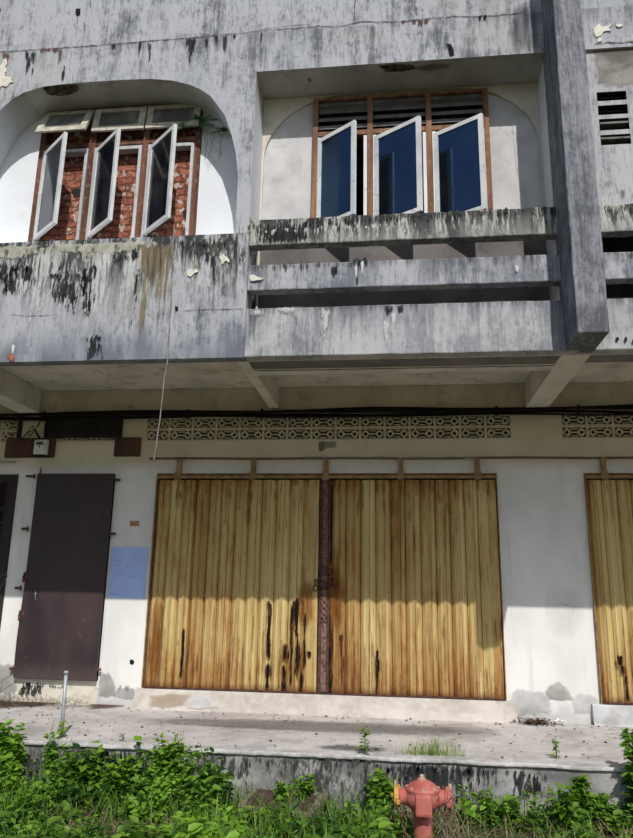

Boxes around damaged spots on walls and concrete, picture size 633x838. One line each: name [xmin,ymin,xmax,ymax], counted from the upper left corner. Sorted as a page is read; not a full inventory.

crack [0,0,523,52]
peeling [0,58,13,88]
water stain [25,51,36,73]
water stain [186,34,236,61]
flaking render [593,23,633,86]
water stain [249,205,553,244]
water stain [0,238,233,333]
water stain [84,334,103,360]
water stain [19,682,63,697]
flaking render [98,674,135,699]
water stain [182,745,550,799]